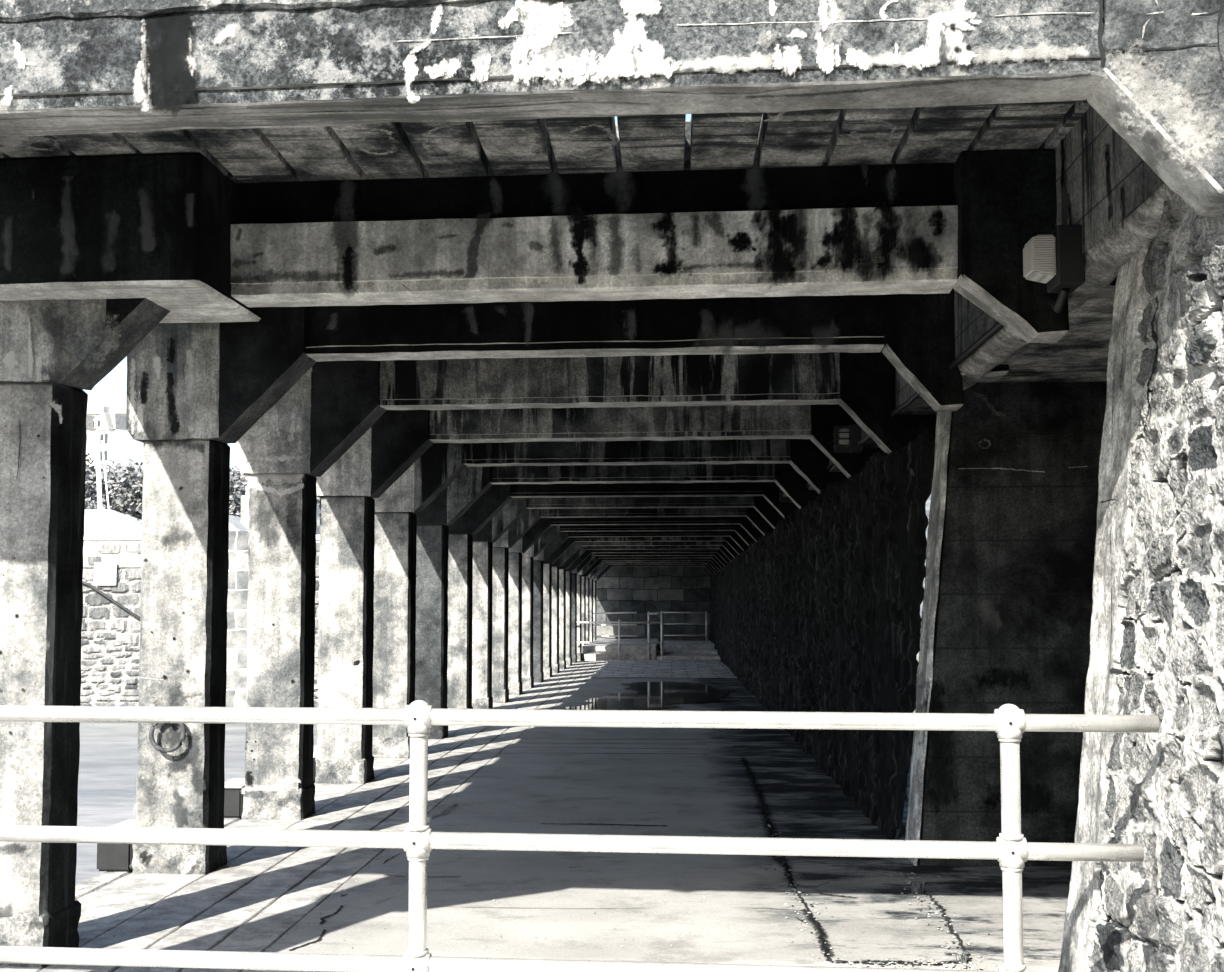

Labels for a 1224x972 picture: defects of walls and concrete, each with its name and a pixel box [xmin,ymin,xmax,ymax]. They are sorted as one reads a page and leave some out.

peeling [424,55,491,82]
peeling [551,2,573,27]
peeling [499,7,629,85]
spalling [757,31,776,48]
leakage [0,0,1090,295]
leakage [1105,144,1125,229]
crack [745,760,971,965]